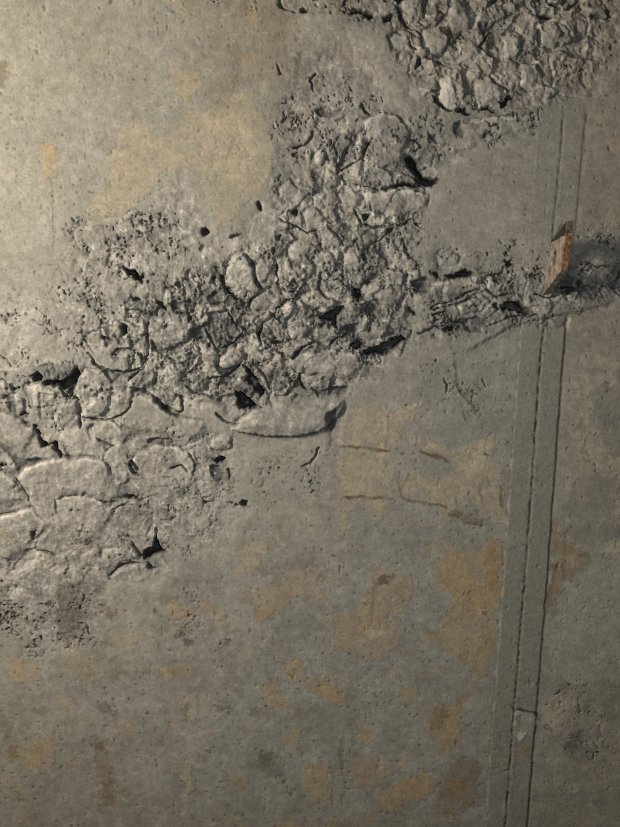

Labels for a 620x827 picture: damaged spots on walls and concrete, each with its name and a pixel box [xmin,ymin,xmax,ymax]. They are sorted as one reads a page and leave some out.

crack [299,382,391,469]
peeling [584,380,620,460]
crack [340,448,452,510]